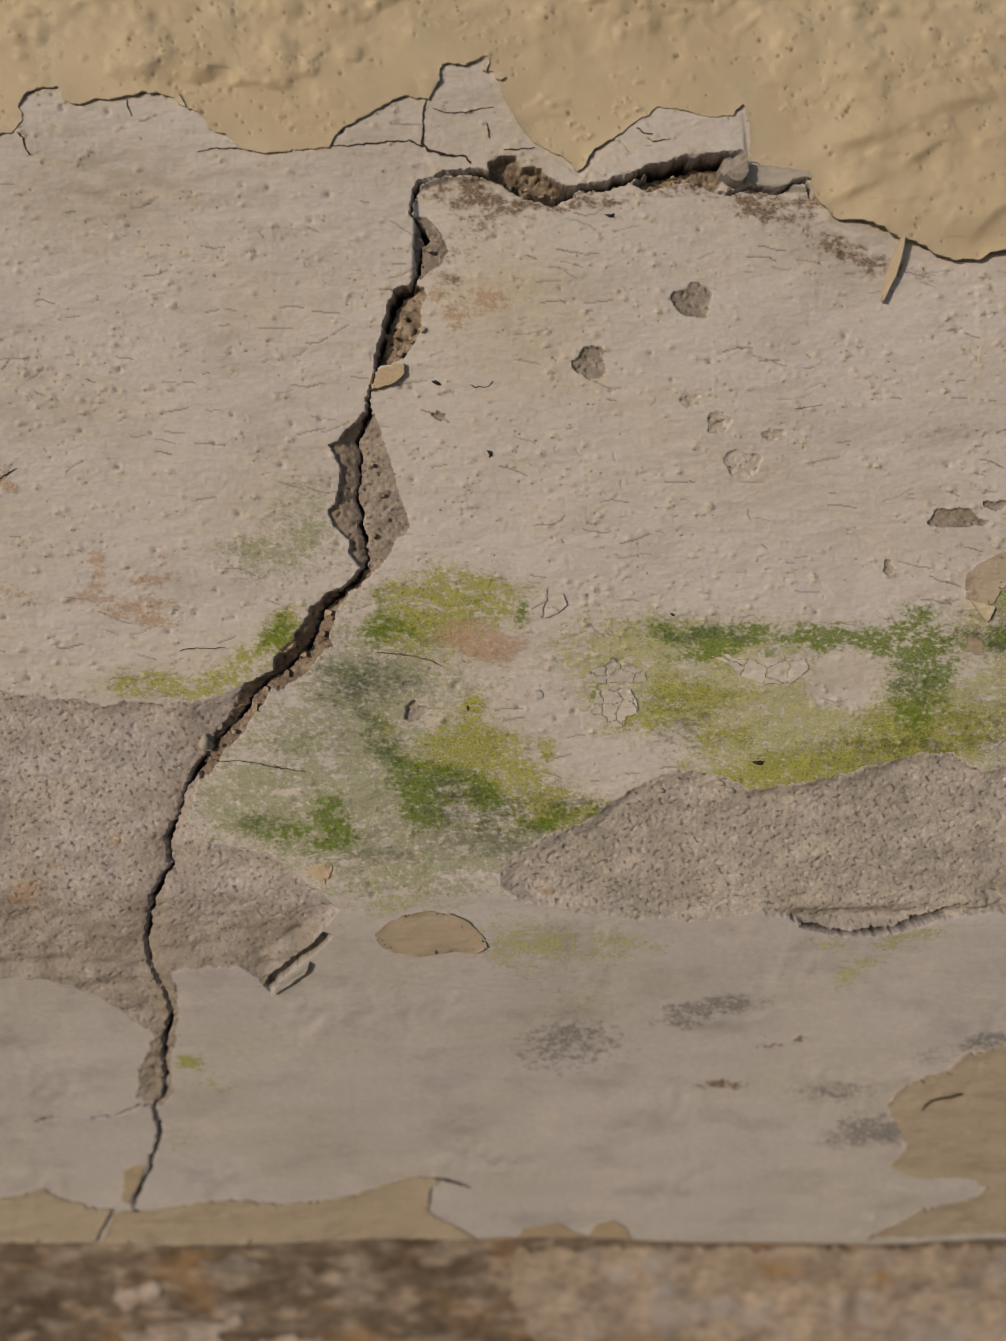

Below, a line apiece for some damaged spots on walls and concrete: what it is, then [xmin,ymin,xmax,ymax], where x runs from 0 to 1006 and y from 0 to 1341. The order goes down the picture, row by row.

crack [33,100,813,1243]
peeling [0,56,1006,1106]